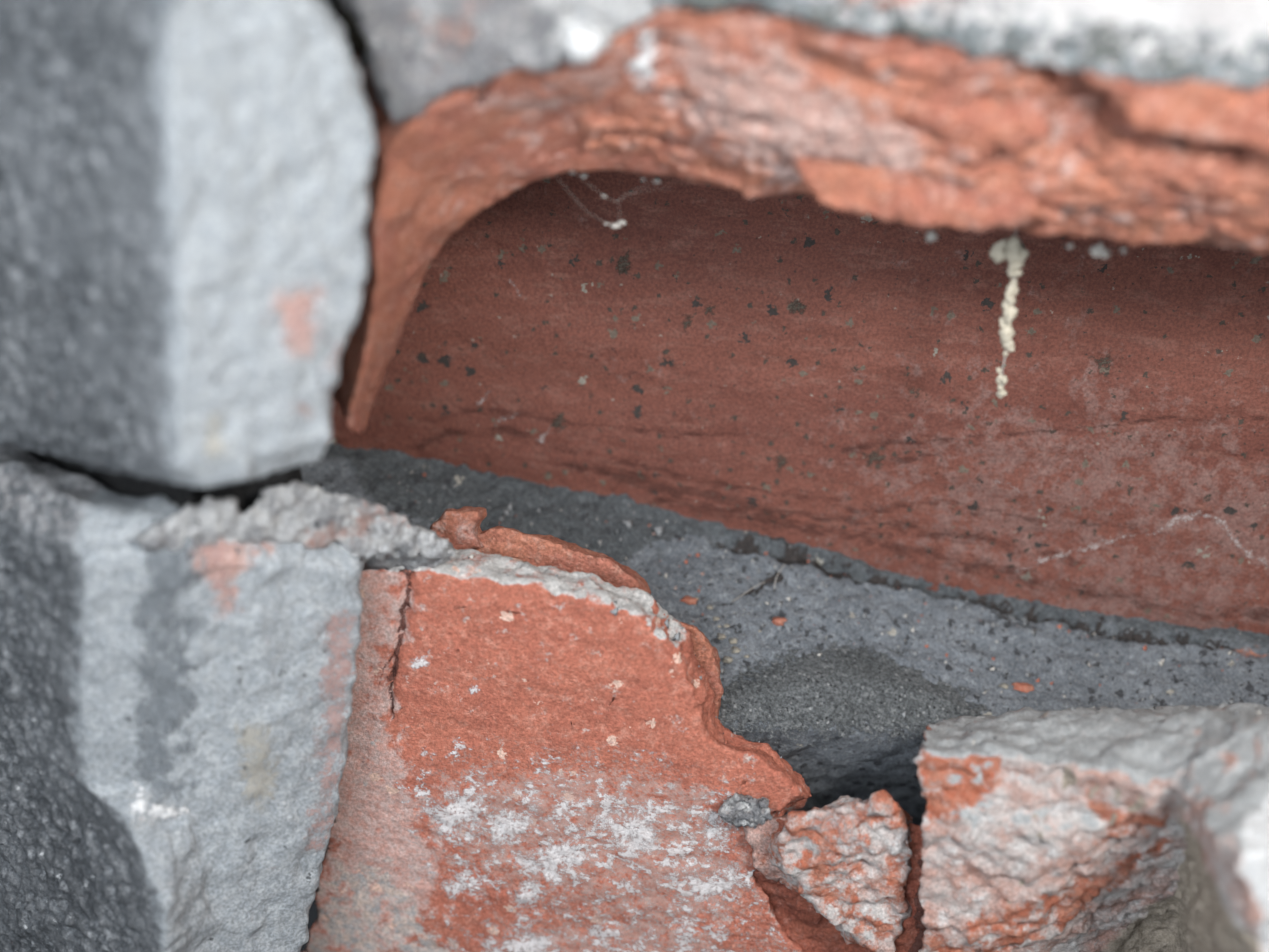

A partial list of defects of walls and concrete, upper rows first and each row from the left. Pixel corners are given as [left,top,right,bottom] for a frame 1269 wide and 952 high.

spalling [328,0,1269,635]
crack [384,570,412,719]
efflorescence [396,737,763,952]
crack [908,859,927,952]